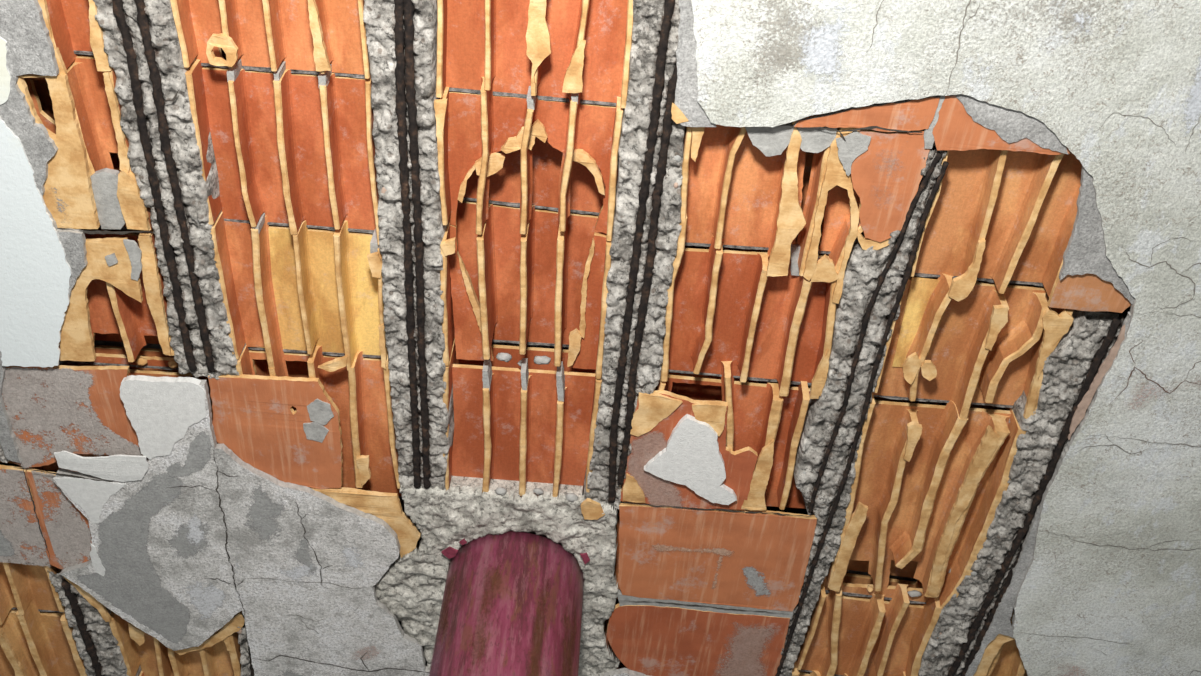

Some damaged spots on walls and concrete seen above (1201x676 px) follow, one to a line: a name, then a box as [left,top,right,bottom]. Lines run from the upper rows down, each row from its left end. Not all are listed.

peeling [745,0,850,85]
spalling [93,0,246,379]
peeling [47,431,226,676]
crack [167,450,429,673]
spalling [363,0,716,676]
rust [782,149,943,668]
spalling [775,94,1070,676]
spalling [918,165,1135,676]
crack [1018,632,1125,655]
crack [1042,531,1199,551]
crack [1077,435,1197,454]
crack [1113,237,1201,401]